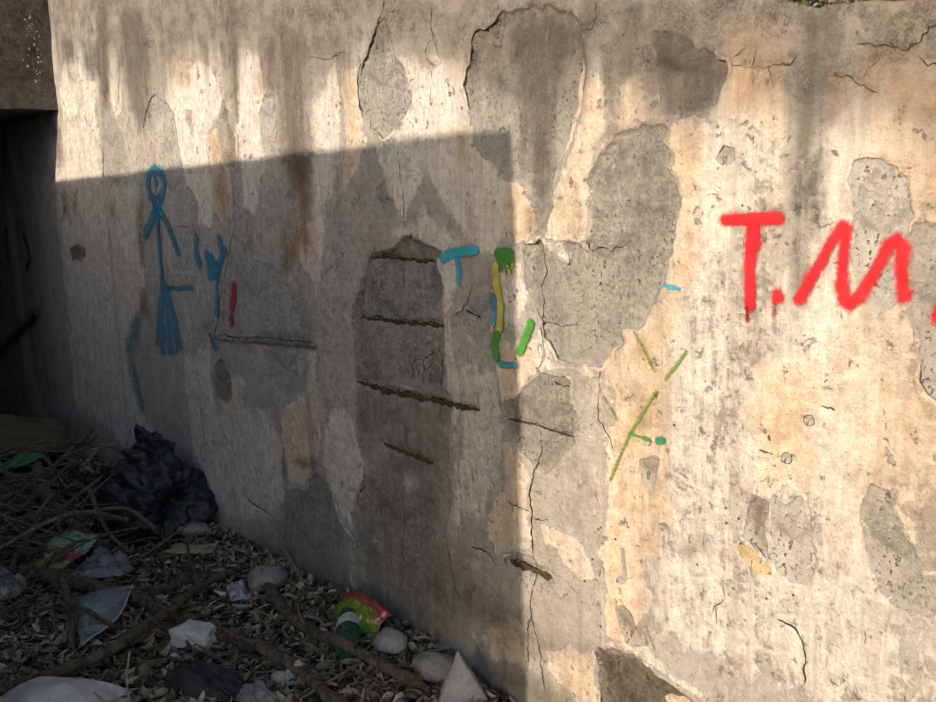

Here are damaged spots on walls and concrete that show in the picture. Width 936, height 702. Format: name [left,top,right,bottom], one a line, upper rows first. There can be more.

leakage [278,45,305,176]
flaking render [359,17,412,143]
flaking render [716,141,735,165]
crack [832,24,936,93]
crack [536,243,574,387]
flaking render [460,4,732,475]
flaking render [844,153,936,409]
spalling [247,235,497,645]
crack [507,440,547,688]
flaking render [736,488,818,587]
flaking render [859,483,936,618]
crack [777,619,806,685]